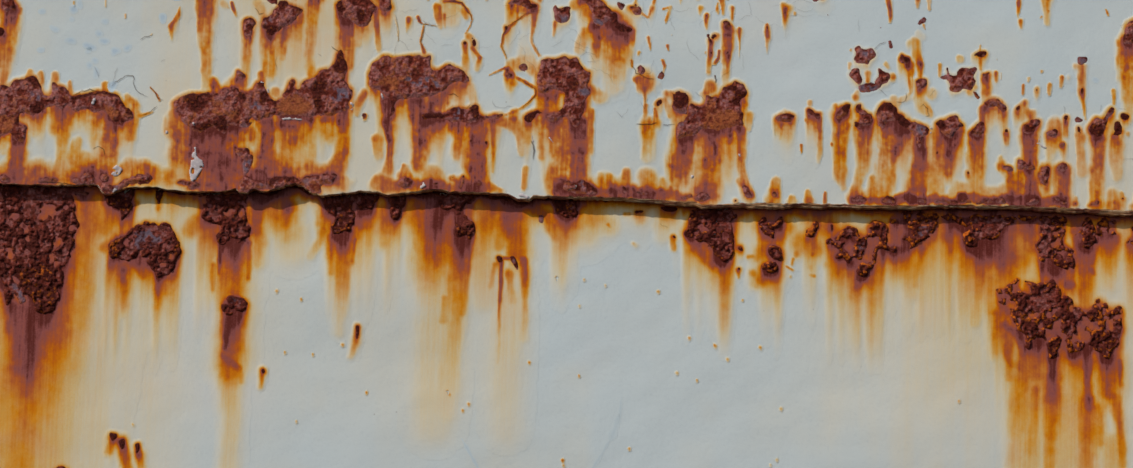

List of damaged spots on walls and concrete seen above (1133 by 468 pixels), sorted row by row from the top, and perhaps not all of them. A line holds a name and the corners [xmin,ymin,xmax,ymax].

corrosion [0,0,26,82]
corrosion [167,6,182,42]
corrosion [763,1,797,55]
corrosion [885,0,893,23]
corrosion [1016,0,1024,33]
corrosion [1038,0,1057,28]
corrosion [183,0,758,205]
corrosion [771,107,800,165]
corrosion [799,16,1133,211]
corrosion [762,174,818,204]
corrosion [0,50,370,468]
corrosion [98,188,1133,468]